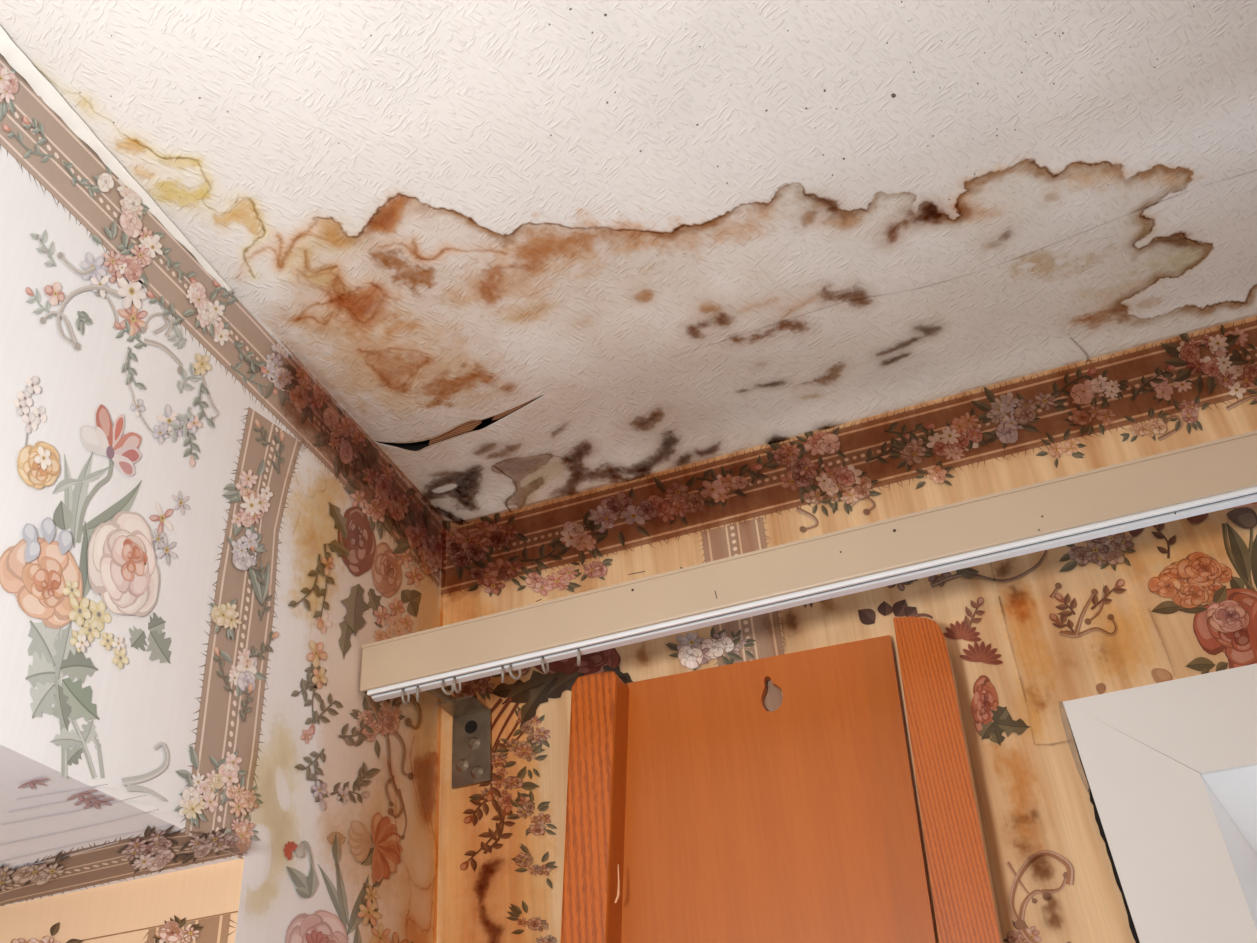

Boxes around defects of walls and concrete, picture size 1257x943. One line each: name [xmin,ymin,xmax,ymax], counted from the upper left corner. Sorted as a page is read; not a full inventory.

water stain [1031,161,1112,177]
water stain [890,178,976,233]
water stain [617,211,729,234]
water stain [1133,208,1212,284]
water stain [824,290,869,304]
water stain [1186,285,1257,311]
water stain [689,314,728,337]
water stain [755,322,803,339]
water stain [878,328,939,365]
mould [634,412,661,429]
mould [545,431,718,495]
mould [422,444,514,525]